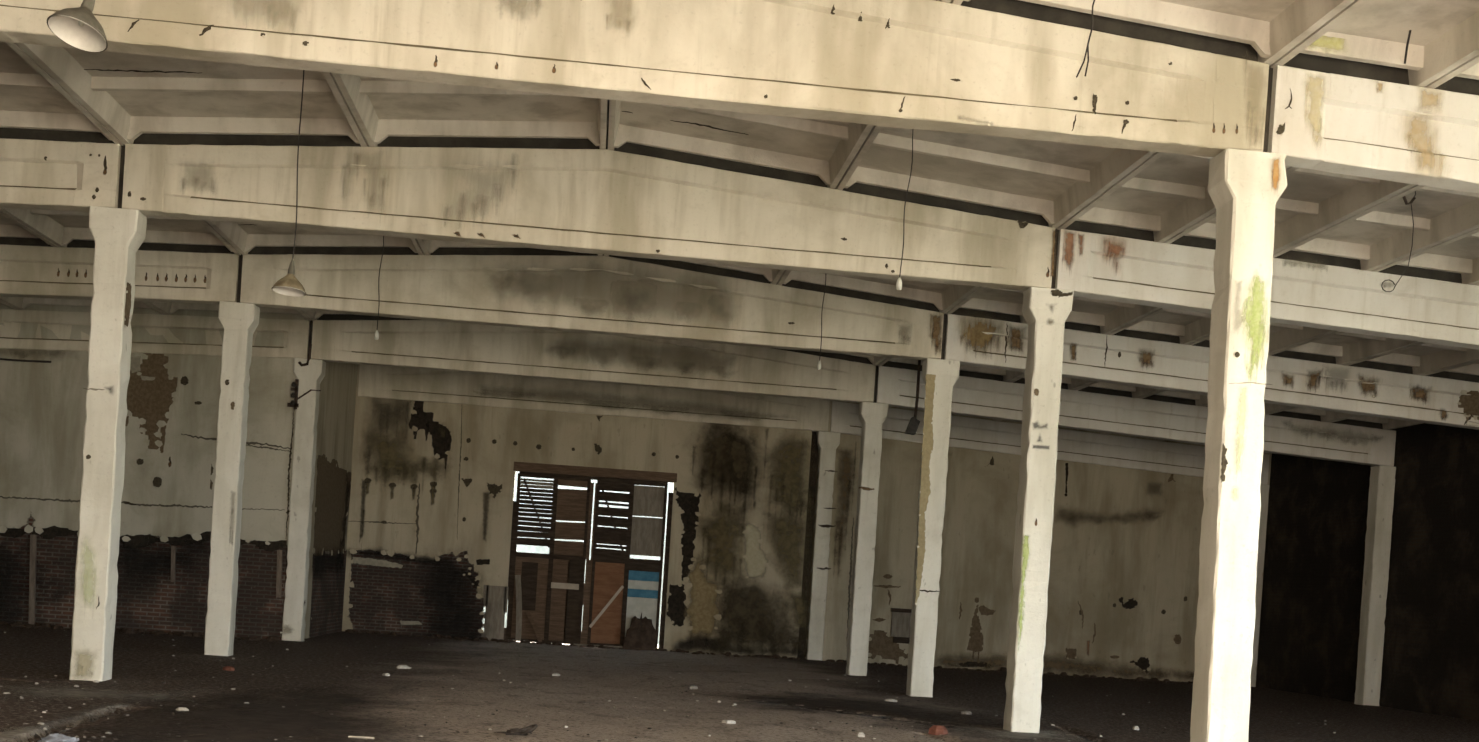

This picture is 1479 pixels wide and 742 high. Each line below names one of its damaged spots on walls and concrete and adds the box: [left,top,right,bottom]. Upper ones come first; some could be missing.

rust [1064,231,1083,266]
rust [1106,240,1124,257]
rust [963,319,1000,351]
peeling [125,353,202,487]
flaking render [0,516,79,628]
flaking render [115,531,211,636]
flaking render [234,452,484,640]
spalling [461,438,503,539]
water stain [700,423,808,650]